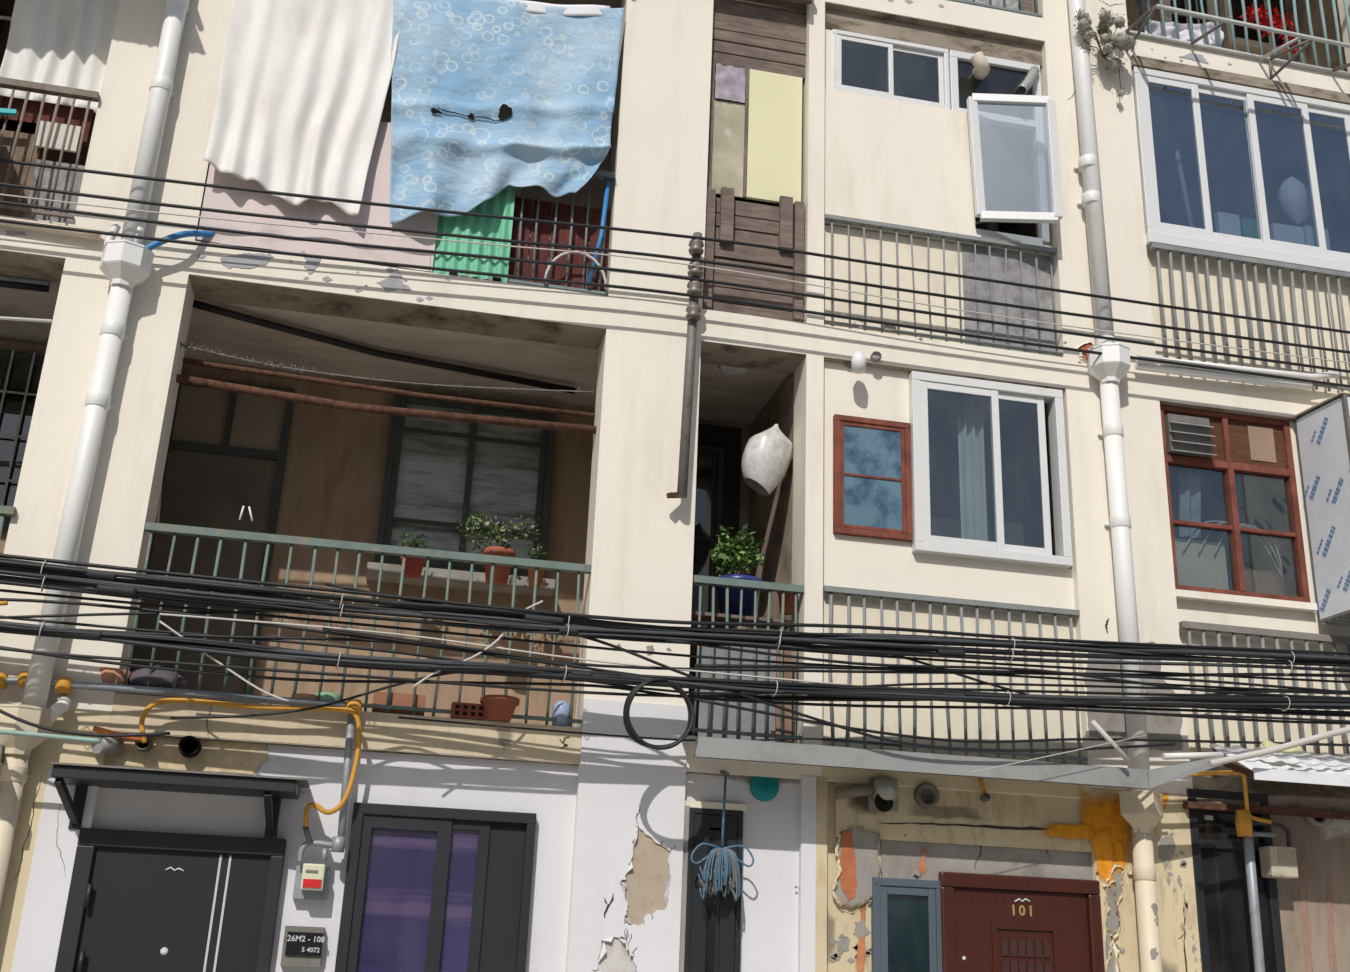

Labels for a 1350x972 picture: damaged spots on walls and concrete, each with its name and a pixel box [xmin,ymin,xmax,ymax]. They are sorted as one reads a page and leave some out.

peeling [198,249,332,282]
peeling [354,267,433,302]
spalling [593,826,676,972]
peeling [828,825,882,963]
peeling [1096,864,1125,972]
crack [1178,897,1188,972]